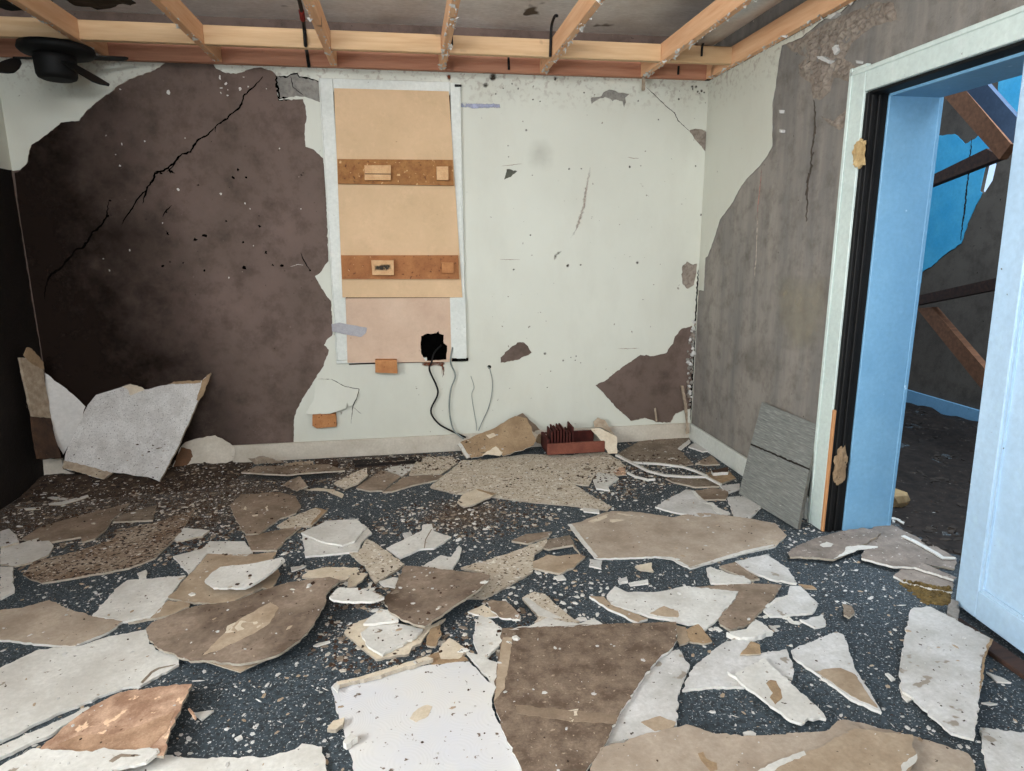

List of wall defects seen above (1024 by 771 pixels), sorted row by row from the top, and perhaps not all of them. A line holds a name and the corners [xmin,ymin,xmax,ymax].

spalling [0,168,56,509]
crack [44,76,263,298]
spalling [71,63,333,445]
spalling [501,342,531,363]
spalling [591,0,1024,458]
crack [805,100,816,222]